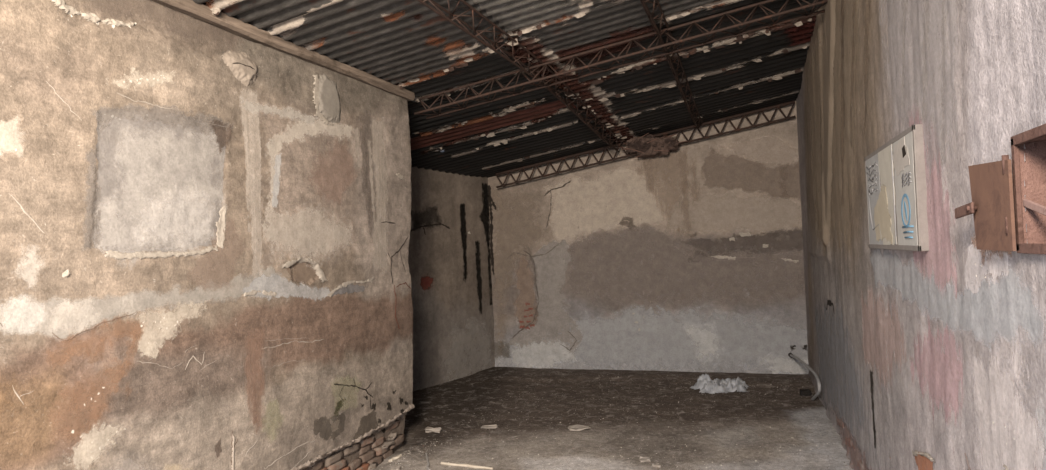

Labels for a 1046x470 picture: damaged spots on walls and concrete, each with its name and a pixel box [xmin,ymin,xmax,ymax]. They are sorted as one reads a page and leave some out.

peeling [268,0,343,37]
rust [783,21,815,48]
peeling [395,44,535,102]
rust [420,0,743,154]
peeling [582,15,816,123]
peeling [415,98,545,136]
peeling [105,204,227,260]
water stain [442,0,957,431]
flaking render [681,228,803,263]
flaking render [282,257,374,297]
flaking render [510,240,583,354]
flaking render [290,390,414,470]